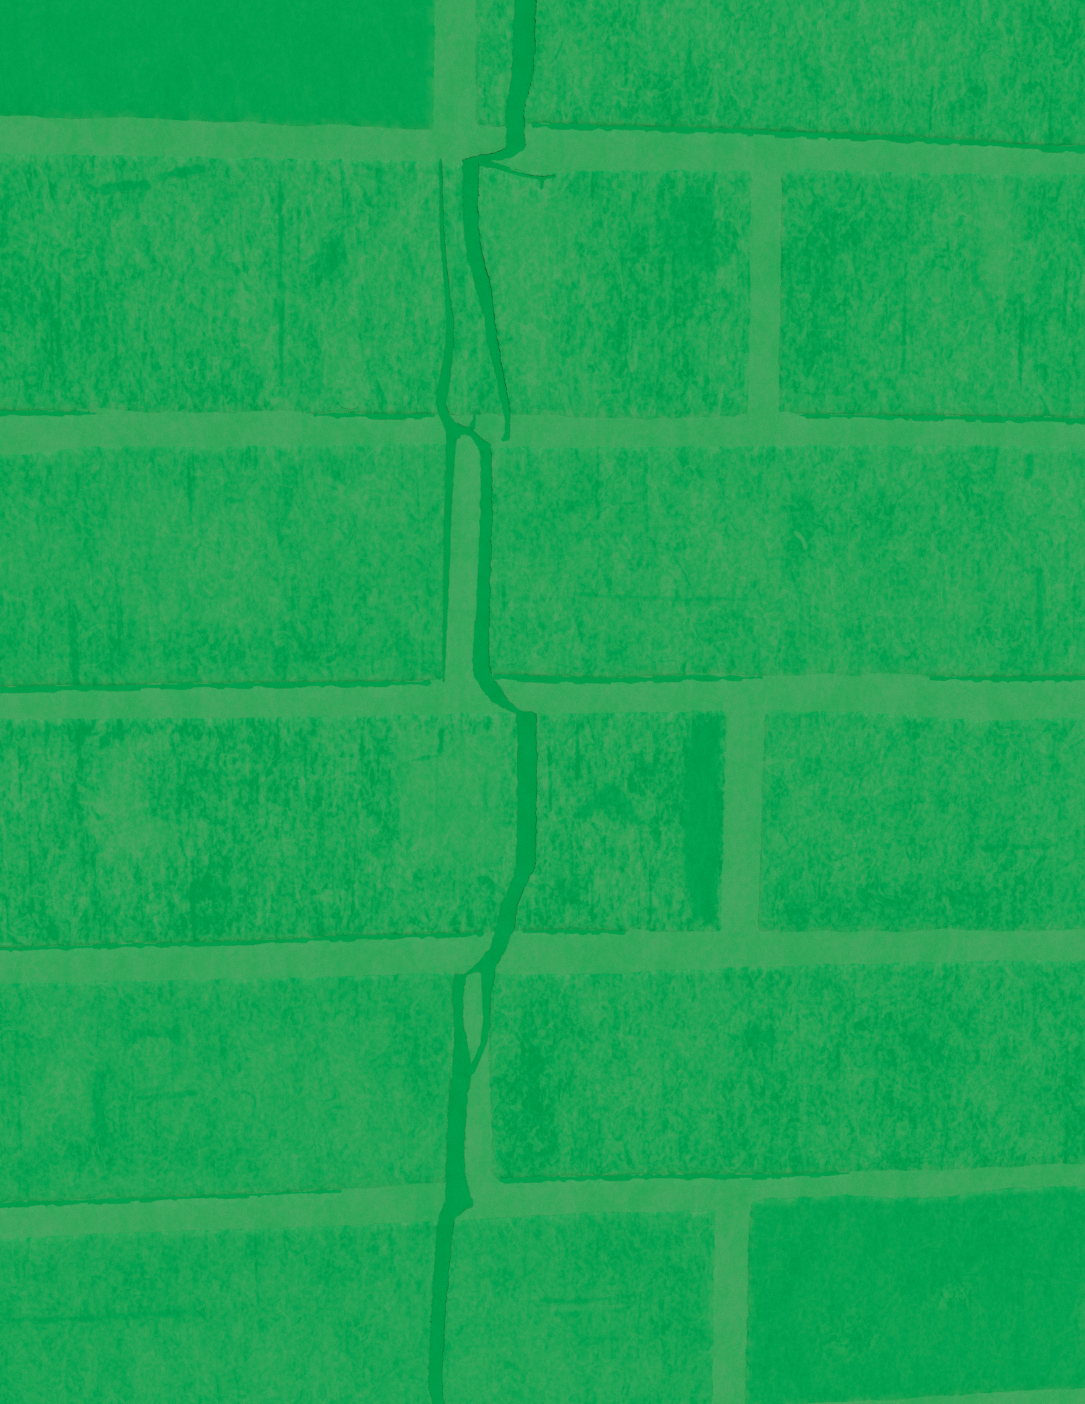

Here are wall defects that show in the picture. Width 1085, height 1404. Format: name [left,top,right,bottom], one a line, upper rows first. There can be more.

crack [0,159,763,1404]
crack [462,0,1085,441]